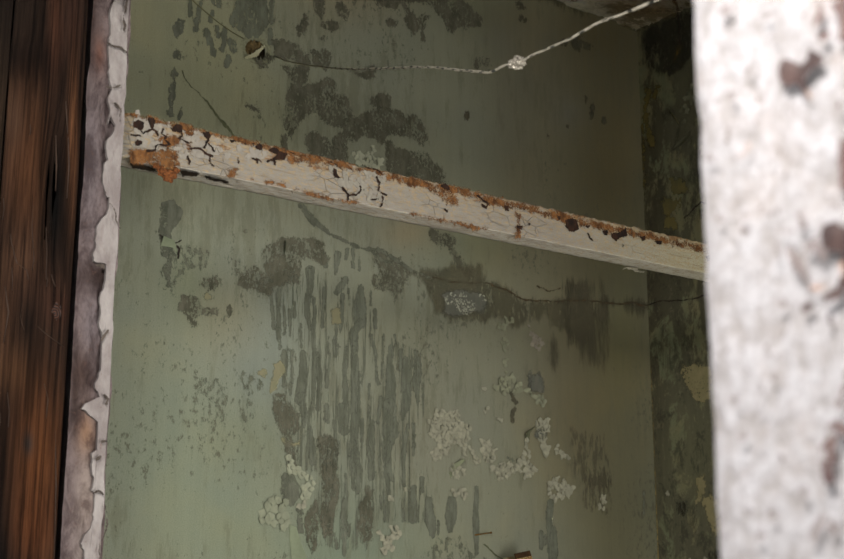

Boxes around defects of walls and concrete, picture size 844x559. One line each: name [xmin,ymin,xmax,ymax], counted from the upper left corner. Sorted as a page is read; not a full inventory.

peeling [373,0,483,42]
water stain [641,12,695,76]
peeling [166,49,183,121]
peeling [172,0,446,184]
rust [128,113,707,258]
peeling [79,0,130,559]
peeling [158,199,234,328]
peeling [429,228,467,268]
peeling [228,236,576,559]
peeling [680,363,712,403]
peeling [695,474,720,536]